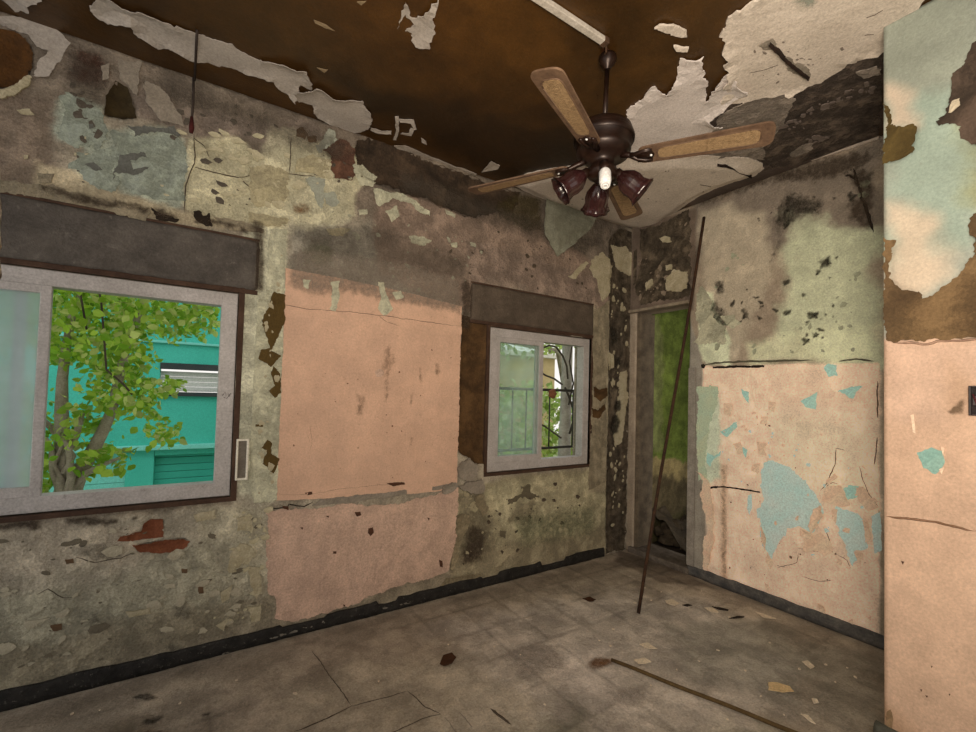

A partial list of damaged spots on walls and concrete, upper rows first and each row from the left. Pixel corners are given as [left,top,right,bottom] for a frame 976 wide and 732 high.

spalling [0,0,521,245]
peeling [626,0,924,171]
peeling [936,41,976,145]
damp [705,152,872,229]
damp [195,219,264,290]
damp [292,246,472,328]
spalling [432,199,742,586]
damp [710,289,791,326]
crack [704,358,813,366]
damp [802,304,834,345]
crack [840,358,972,531]
peeling [882,213,976,343]